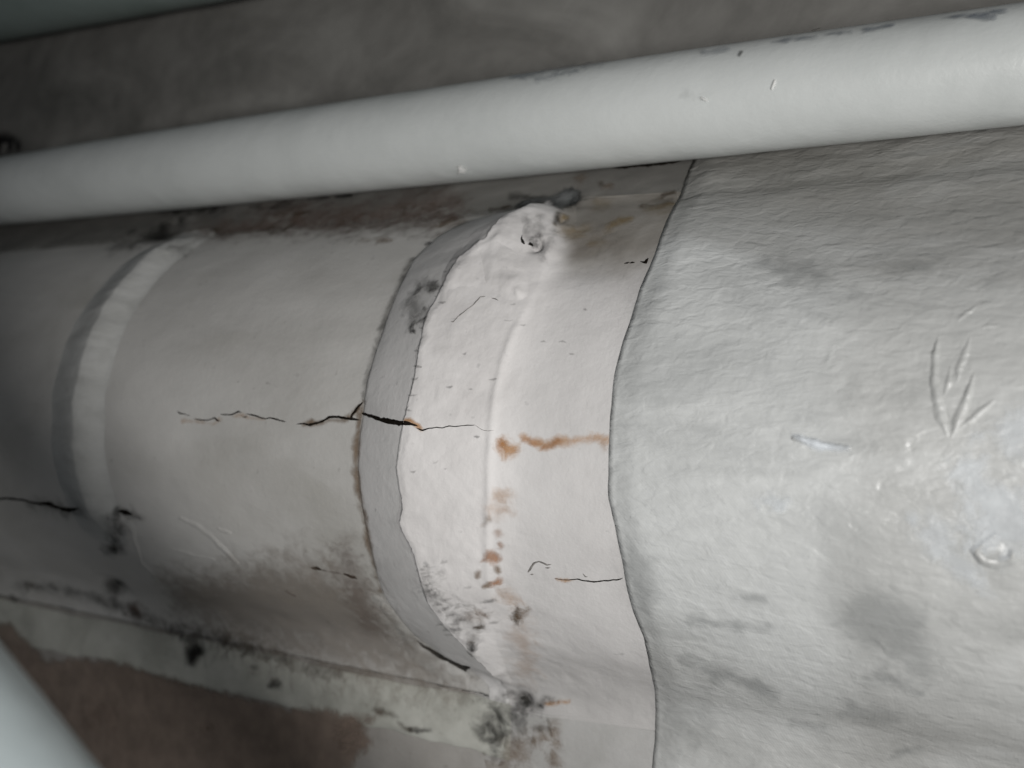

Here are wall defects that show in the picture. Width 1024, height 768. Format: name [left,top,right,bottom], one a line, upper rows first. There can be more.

crack [177,402,494,431]
crack [0,497,78,512]
crack [118,508,132,516]
corrosion [477,552,500,587]
crack [528,561,623,583]
water stain [0,623,370,768]